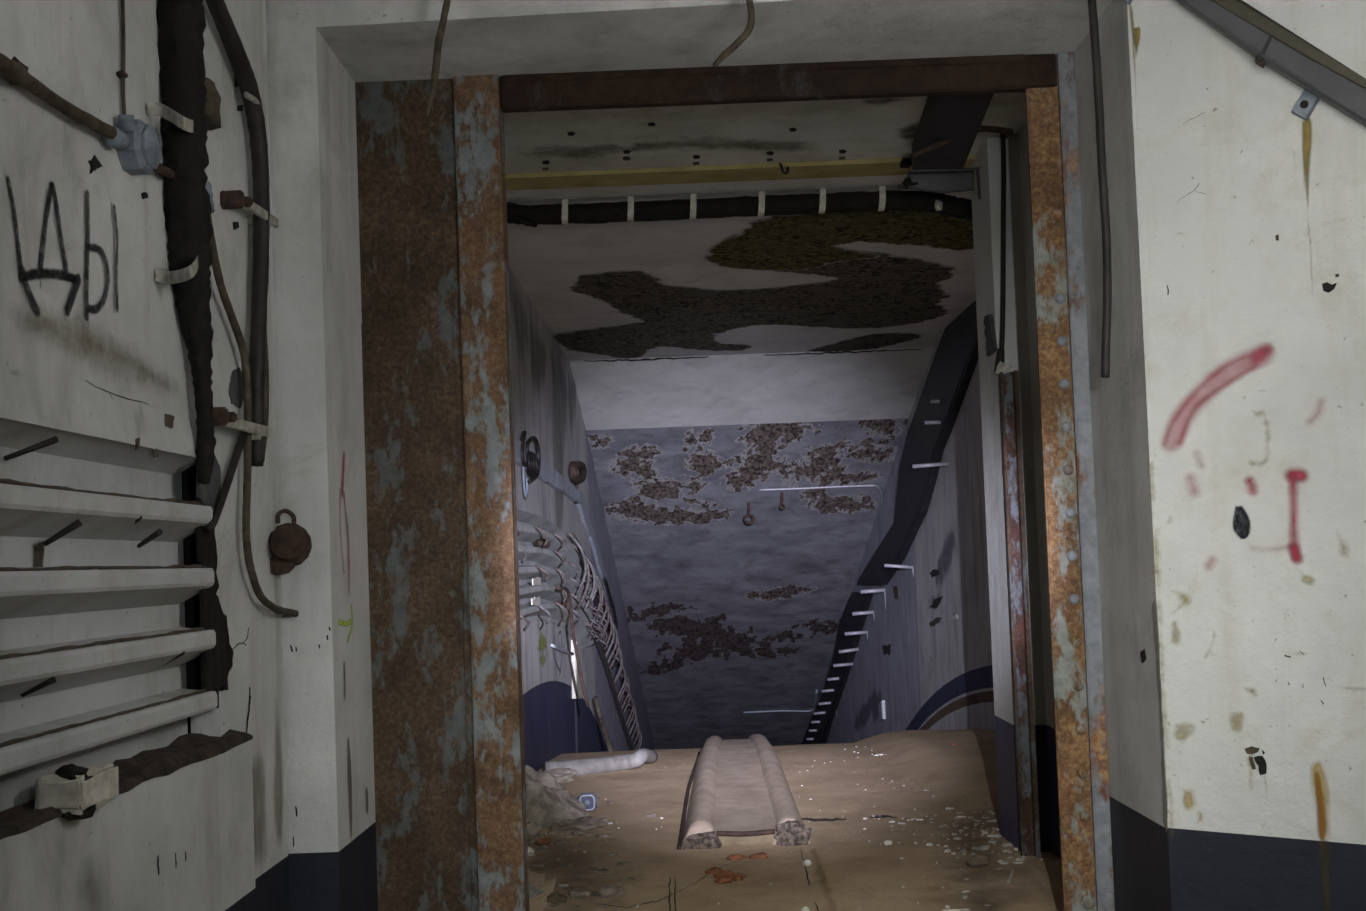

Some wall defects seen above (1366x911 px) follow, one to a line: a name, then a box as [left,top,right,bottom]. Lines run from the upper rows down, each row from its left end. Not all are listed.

peeling [553,211,974,359]
peeling [984,314,998,356]
peeling [587,418,908,526]
peeling [625,601,841,677]
peeling [744,585,818,601]
rust [1313,764,1330,911]